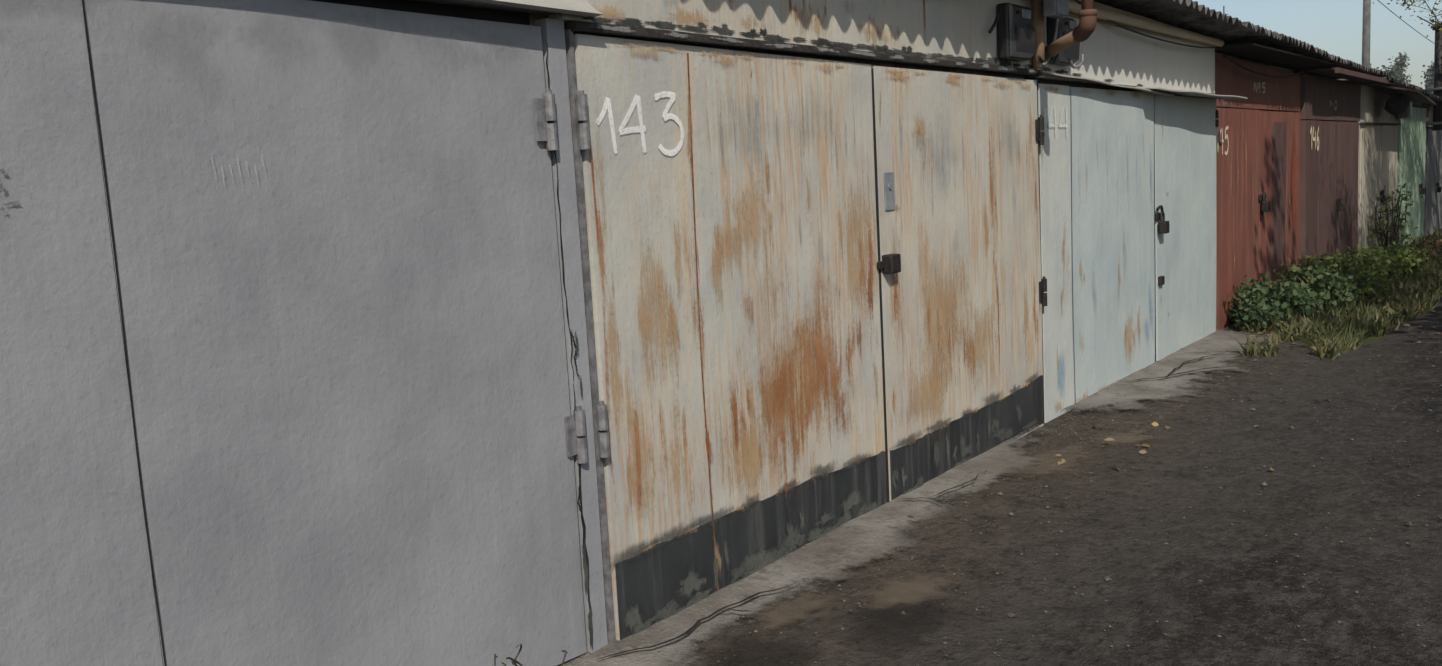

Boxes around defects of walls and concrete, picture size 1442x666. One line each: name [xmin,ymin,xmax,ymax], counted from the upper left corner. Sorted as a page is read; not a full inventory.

corrosion [590,147,687,507]
corrosion [639,163,772,377]
corrosion [706,197,876,486]
corrosion [874,245,1000,418]
corrosion [984,142,997,273]